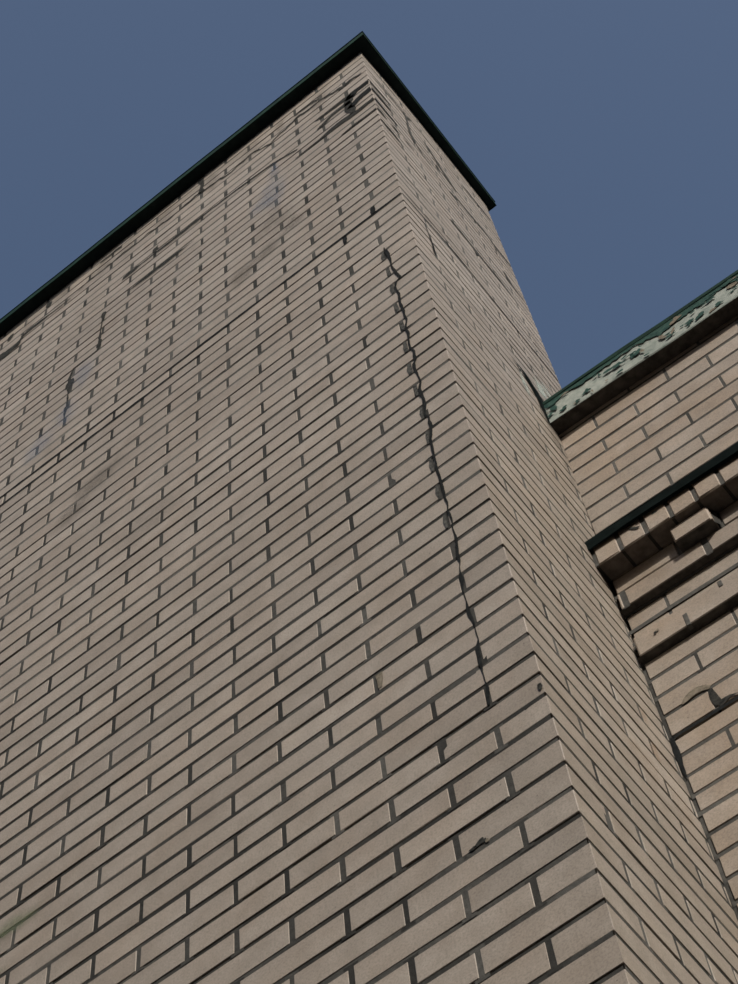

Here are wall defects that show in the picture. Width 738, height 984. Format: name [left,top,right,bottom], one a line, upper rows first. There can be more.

crack [80,74,432,289]
crack [63,311,106,419]
peeling [544,274,738,417]
crack [381,248,490,705]